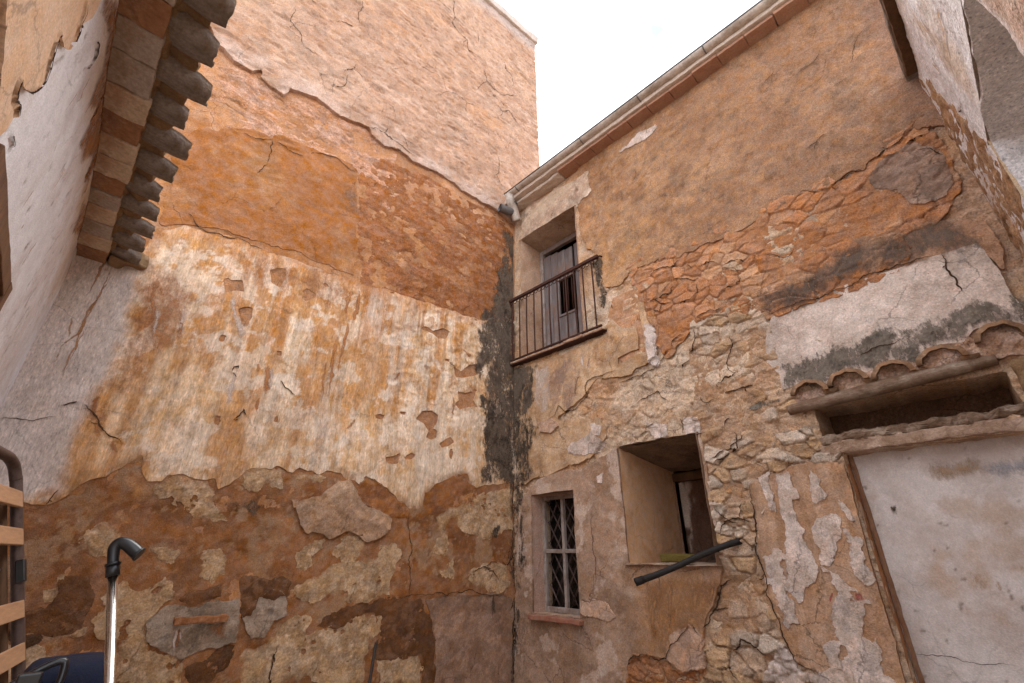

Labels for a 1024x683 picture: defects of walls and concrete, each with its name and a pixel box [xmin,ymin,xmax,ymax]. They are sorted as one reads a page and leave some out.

crack [245,133,353,173]
spalling [209,66,592,318]
crack [13,401,122,443]
spalling [238,307,252,327]
damp [475,229,589,587]
flaking render [566,423,607,456]
crack [553,249,794,464]
spalling [608,78,1024,683]
crack [770,254,962,314]
damp [747,295,1024,410]
spalling [24,455,515,683]
crack [714,486,809,669]